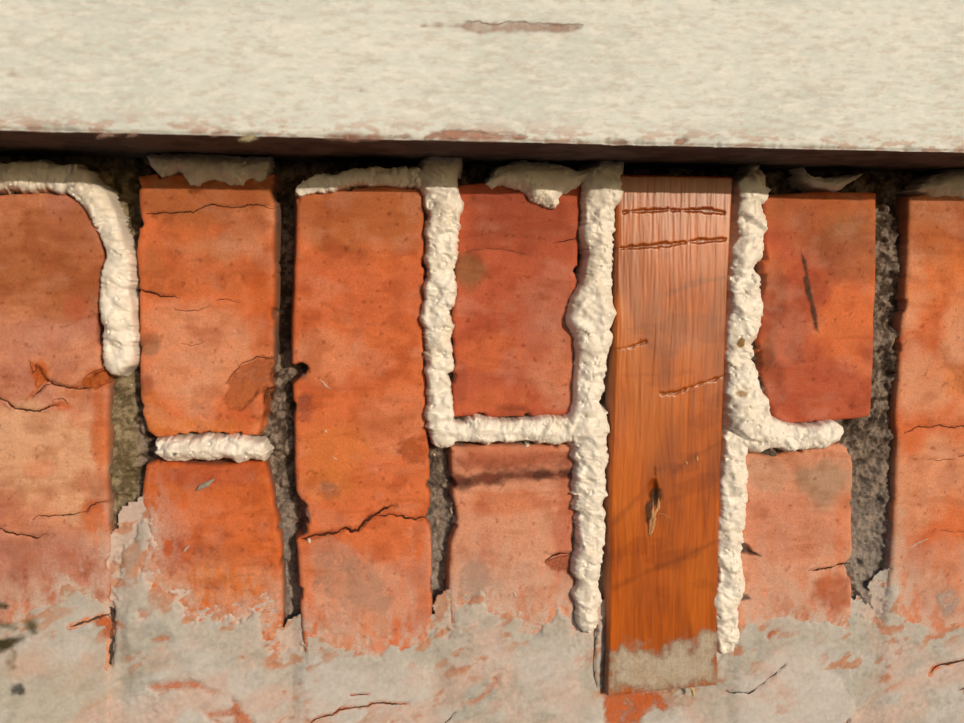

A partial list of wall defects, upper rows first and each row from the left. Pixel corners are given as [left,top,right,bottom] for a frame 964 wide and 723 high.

crack [147,204,274,215]
crack [0,375,111,412]
spalling [76,367,108,389]
spalling [225,356,275,416]
spalling [297,497,310,534]
crack [301,505,428,540]
spalling [546,555,571,572]
flaking render [88,614,113,635]
crack [931,659,964,672]
crack [311,694,406,723]